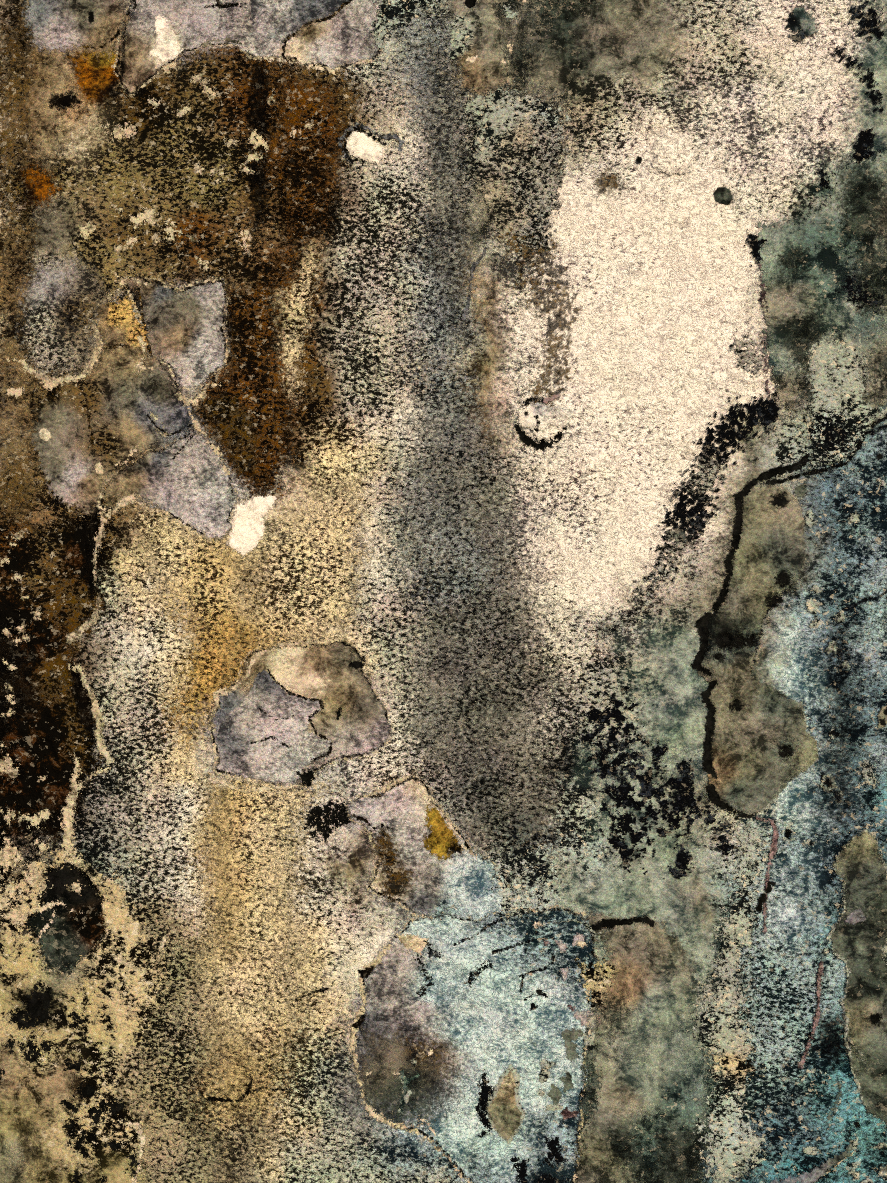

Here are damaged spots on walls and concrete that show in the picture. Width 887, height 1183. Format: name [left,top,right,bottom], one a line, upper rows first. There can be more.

corrosion [5,45,366,505]
crack [761,360,887,485]
crack [842,591,887,611]
flaking render [206,628,392,793]